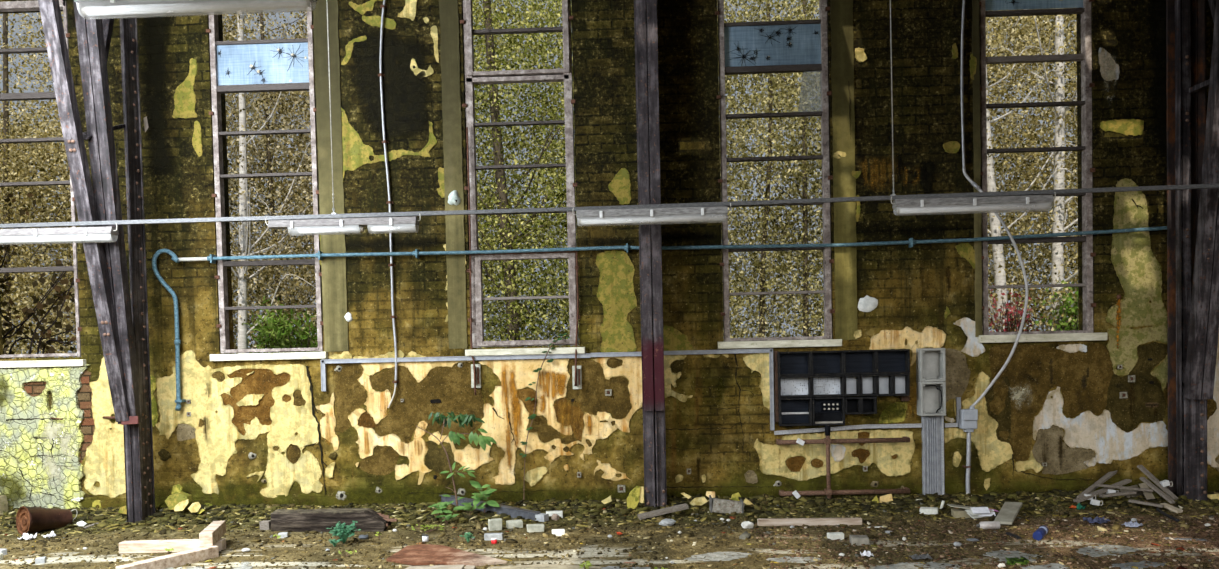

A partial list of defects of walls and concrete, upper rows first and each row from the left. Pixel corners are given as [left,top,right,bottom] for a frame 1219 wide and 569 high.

peeling [341,0,439,77]
peeling [341,108,445,198]
crack [0,364,89,509]
peeling [77,357,126,508]
peeling [150,250,643,506]
peeling [754,402,915,481]
flaking render [854,178,1168,475]
peeling [1207,336,1219,472]